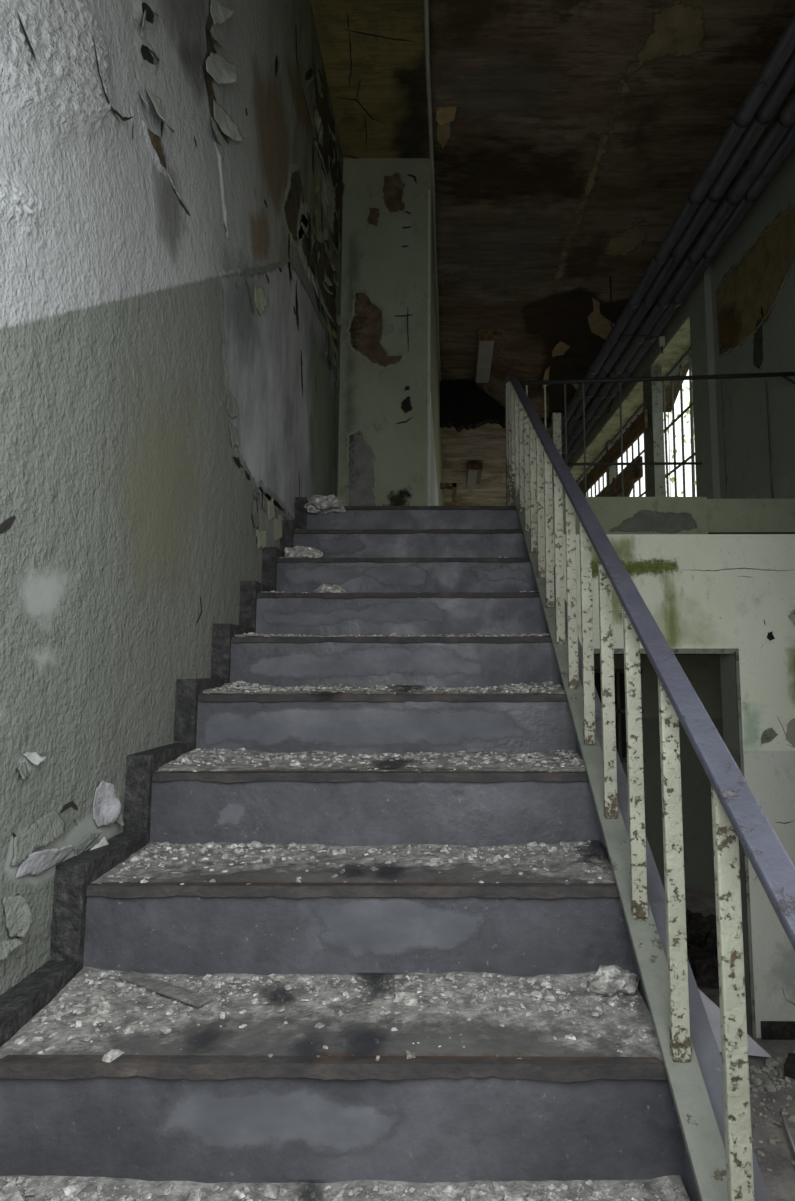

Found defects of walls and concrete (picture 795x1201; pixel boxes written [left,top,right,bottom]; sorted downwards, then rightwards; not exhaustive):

peeling [132,0,175,177]
peeling [202,0,244,145]
leakage [394,58,587,206]
peeling [220,64,407,549]
peeling [753,318,763,366]
spalling [764,628,778,644]
flaking render [761,718,795,747]
peeling [4,780,124,884]